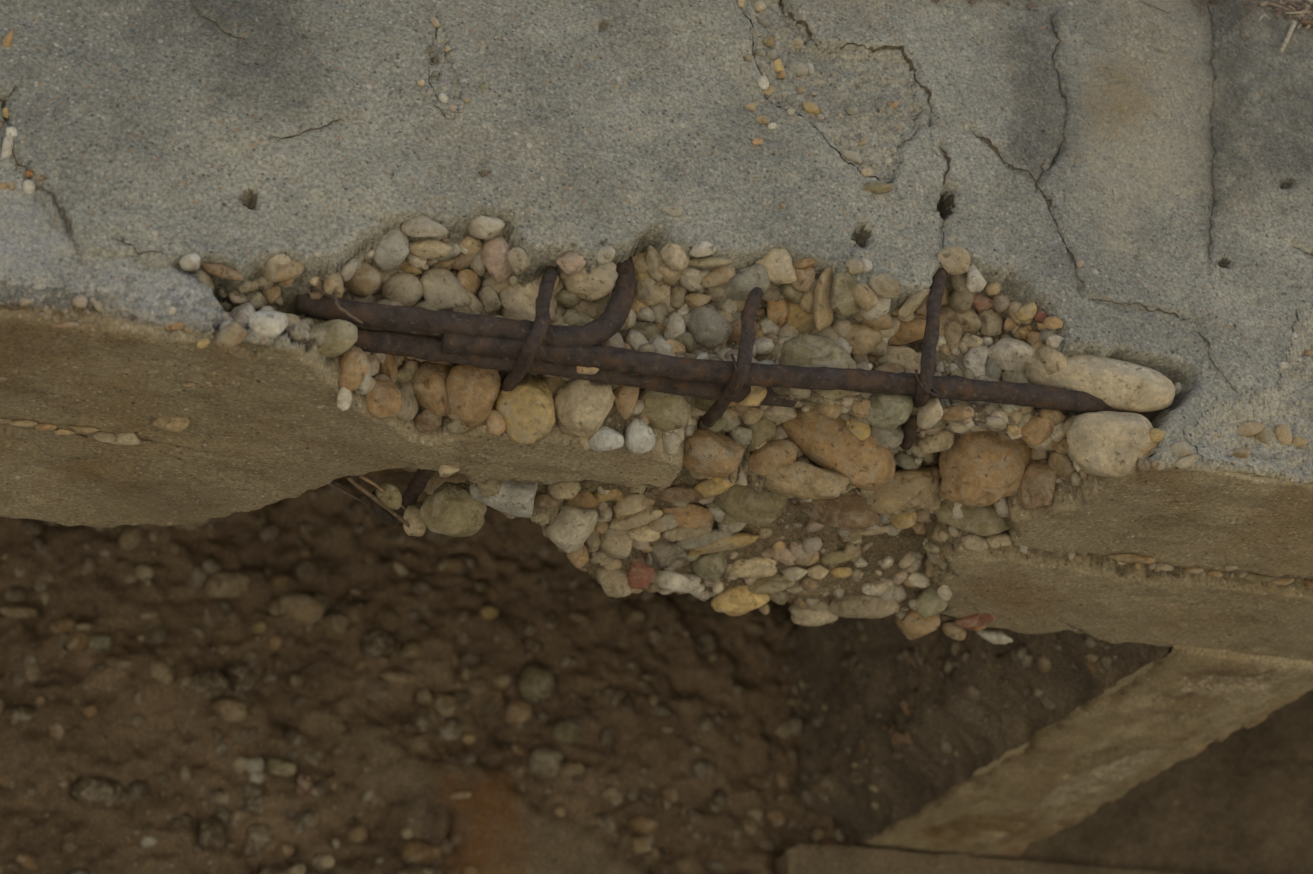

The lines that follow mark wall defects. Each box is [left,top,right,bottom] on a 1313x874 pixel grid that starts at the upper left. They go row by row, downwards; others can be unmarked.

crack [0,86,76,245]
crack [113,238,167,255]
spalling [417,28,489,121]
spalling [738,0,923,194]
crack [779,0,951,269]
crack [972,4,1236,391]
peeling [0,137,1313,662]
spalling [0,605,135,740]
spalling [58,760,147,807]
spalling [113,517,657,874]
spalling [592,657,847,874]